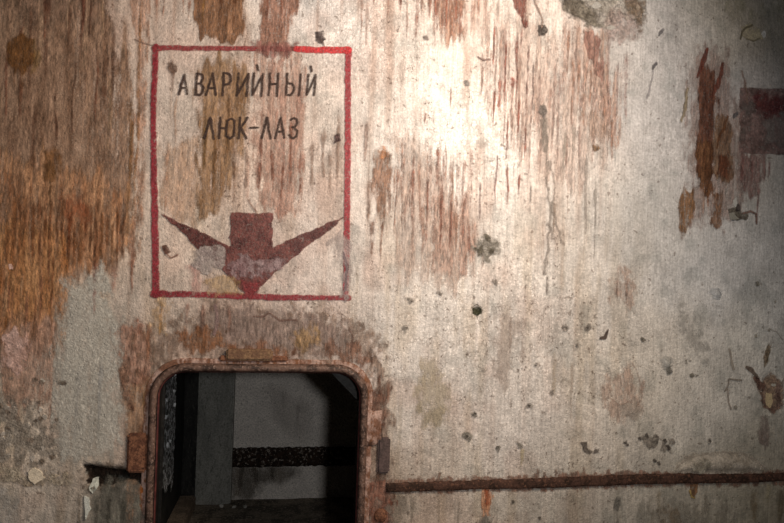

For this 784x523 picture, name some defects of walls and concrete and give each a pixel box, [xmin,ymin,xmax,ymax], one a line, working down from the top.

rust [0,0,164,414]
rust [161,0,340,226]
rust [364,124,477,296]
rust [429,0,465,46]
rust [474,0,621,201]
rust [678,43,770,233]
peeling [0,261,141,519]
rust [115,275,396,441]
rust [369,445,722,523]
spalling [745,344,784,416]